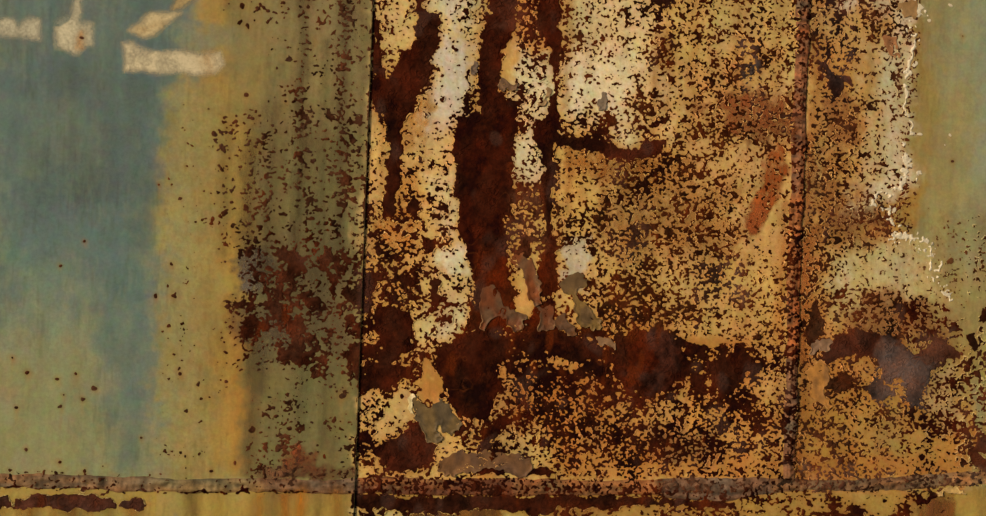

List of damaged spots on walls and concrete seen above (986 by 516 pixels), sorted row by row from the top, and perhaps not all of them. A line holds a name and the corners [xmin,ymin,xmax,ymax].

rust [237,1,290,29]
spalling [288,0,792,359]
spalling [800,0,959,355]
rust [830,233,926,299]
rust [916,215,986,314]
spalling [403,318,783,479]
spalling [793,338,966,479]
rust [3,461,120,490]
rust [177,472,261,495]
rust [850,424,891,471]
peeling [937,486,966,497]
peeling [967,446,986,474]